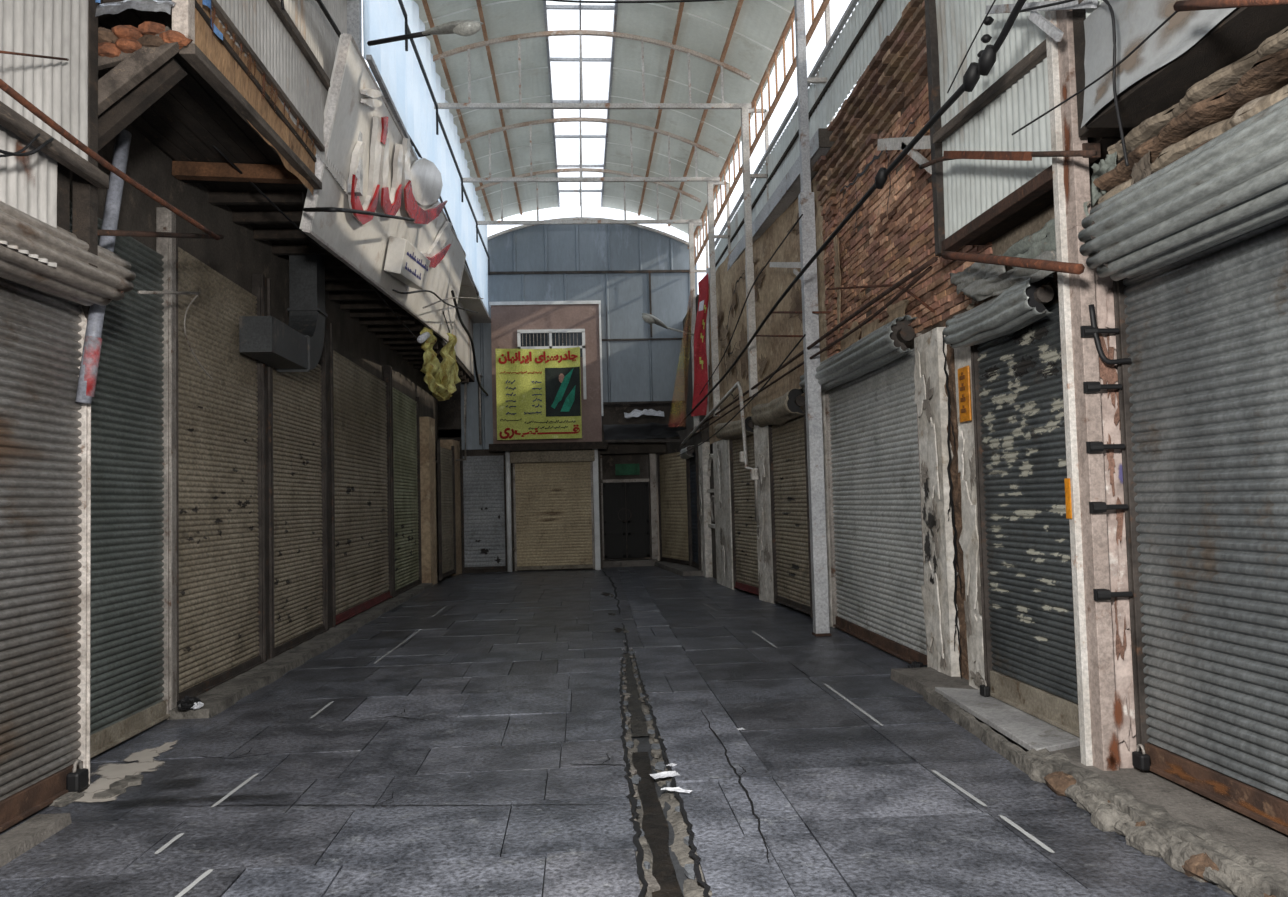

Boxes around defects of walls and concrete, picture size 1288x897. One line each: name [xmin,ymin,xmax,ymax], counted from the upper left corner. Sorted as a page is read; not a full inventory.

peeling [833,235,910,351]
peeling [914,350,947,670]
crack [579,570,713,897]
crack [701,711,769,862]
rust [1107,695,1123,771]